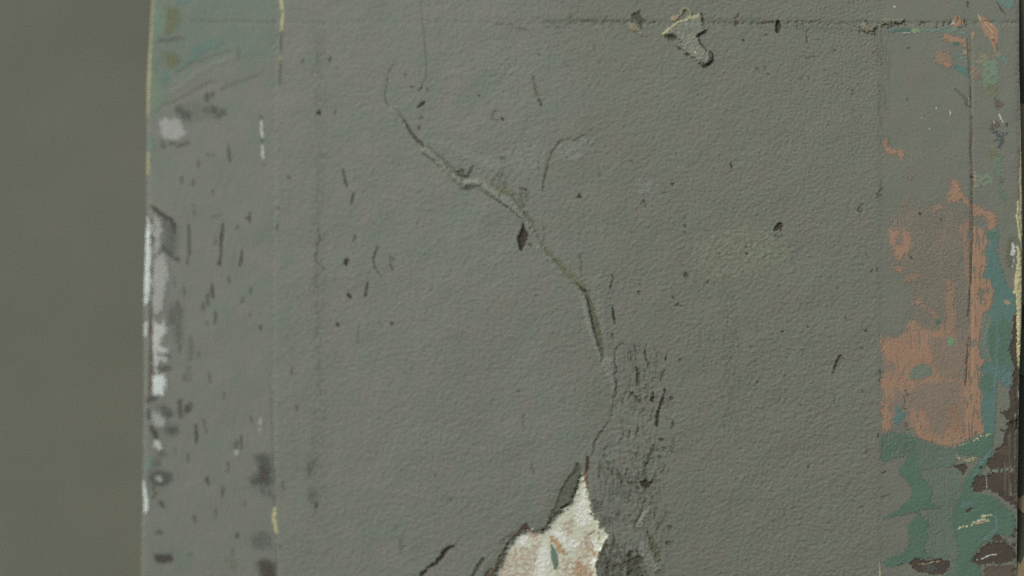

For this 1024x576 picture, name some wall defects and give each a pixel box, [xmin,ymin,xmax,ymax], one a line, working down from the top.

peeling [858,0,1019,99]
crack [384,61,625,515]
spalling [489,345,674,576]
peeling [865,97,1024,576]